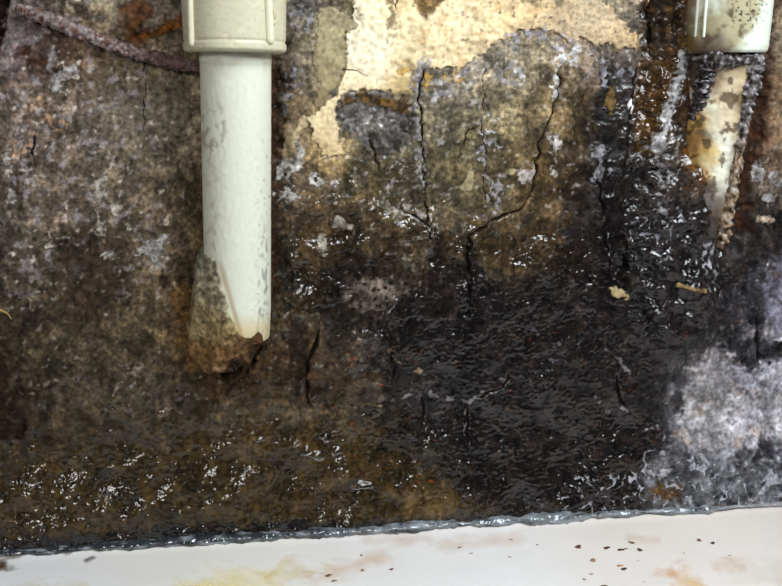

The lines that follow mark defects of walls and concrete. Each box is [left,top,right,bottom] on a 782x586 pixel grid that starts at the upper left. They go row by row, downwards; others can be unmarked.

crack [0,0,10,41]
corrosion [14,0,200,73]
damp [272,135,305,203]
crack [402,67,433,243]
peeling [278,0,640,162]
flaking render [460,171,474,193]
crack [457,65,562,312]
corrosion [638,52,685,153]
corrosion [683,147,706,184]
corrosion [734,72,770,230]
damp [285,0,782,516]
damp [0,425,407,550]